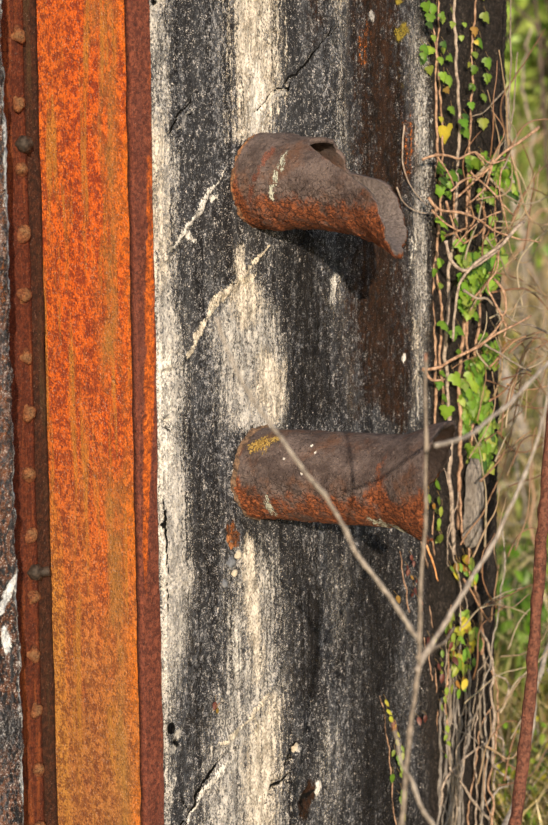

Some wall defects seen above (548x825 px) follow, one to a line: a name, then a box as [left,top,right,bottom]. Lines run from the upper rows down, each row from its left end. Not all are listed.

crack [167,91,199,138]
crack [254,24,343,118]
rust [338,0,423,434]
crack [180,751,229,825]